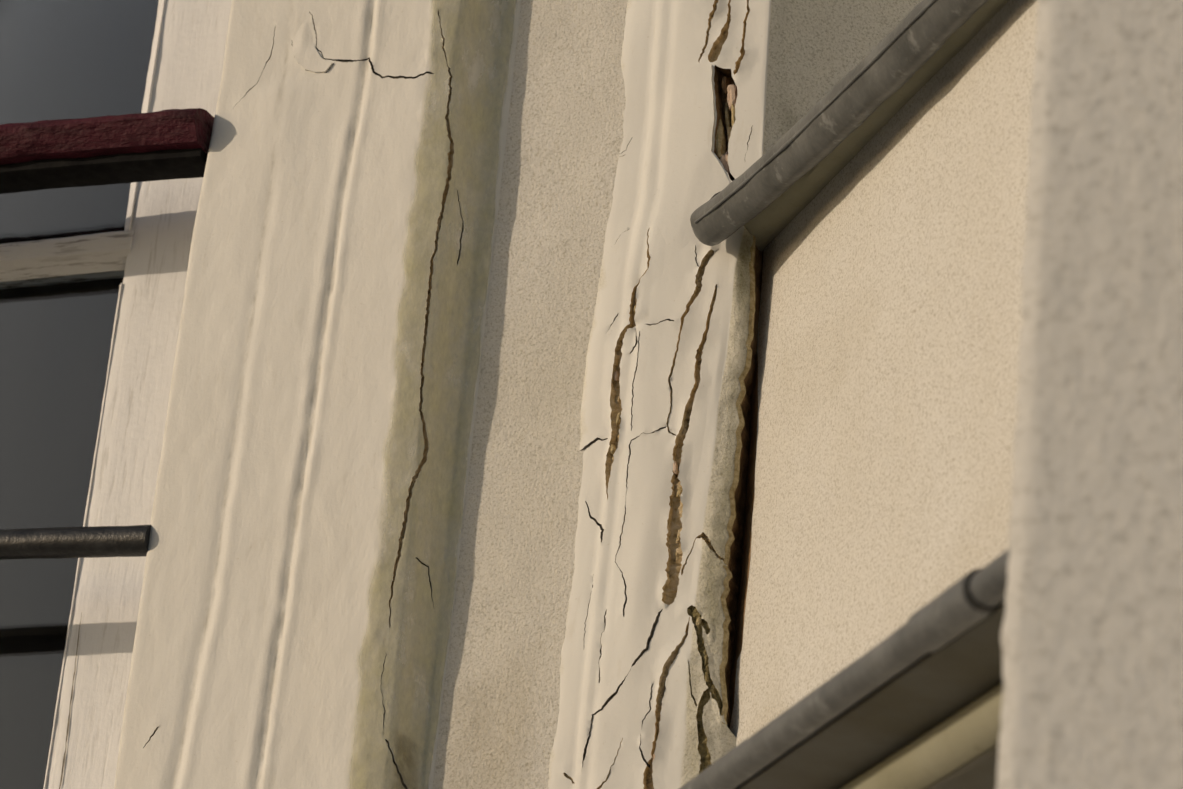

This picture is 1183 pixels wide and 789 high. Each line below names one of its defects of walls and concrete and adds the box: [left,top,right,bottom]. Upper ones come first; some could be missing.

crack [235,10,464,789]
crack [563,229,764,789]
crack [698,0,750,75]
spalling [714,65,738,181]